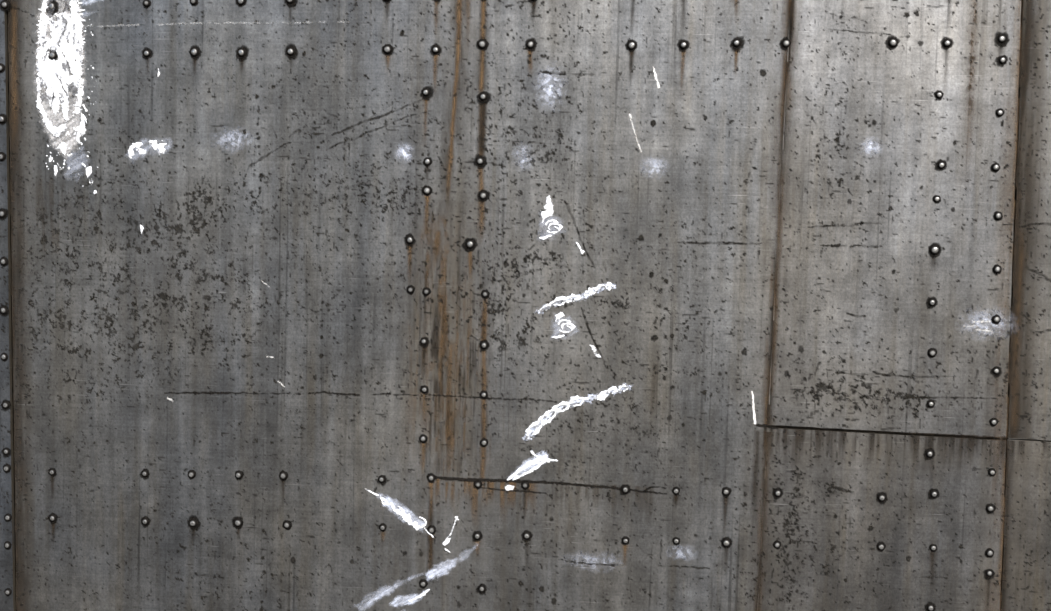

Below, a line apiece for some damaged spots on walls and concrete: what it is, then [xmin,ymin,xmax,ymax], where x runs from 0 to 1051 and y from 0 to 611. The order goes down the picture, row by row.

corrosion [446,0,462,183]
leakage [912,433,985,449]